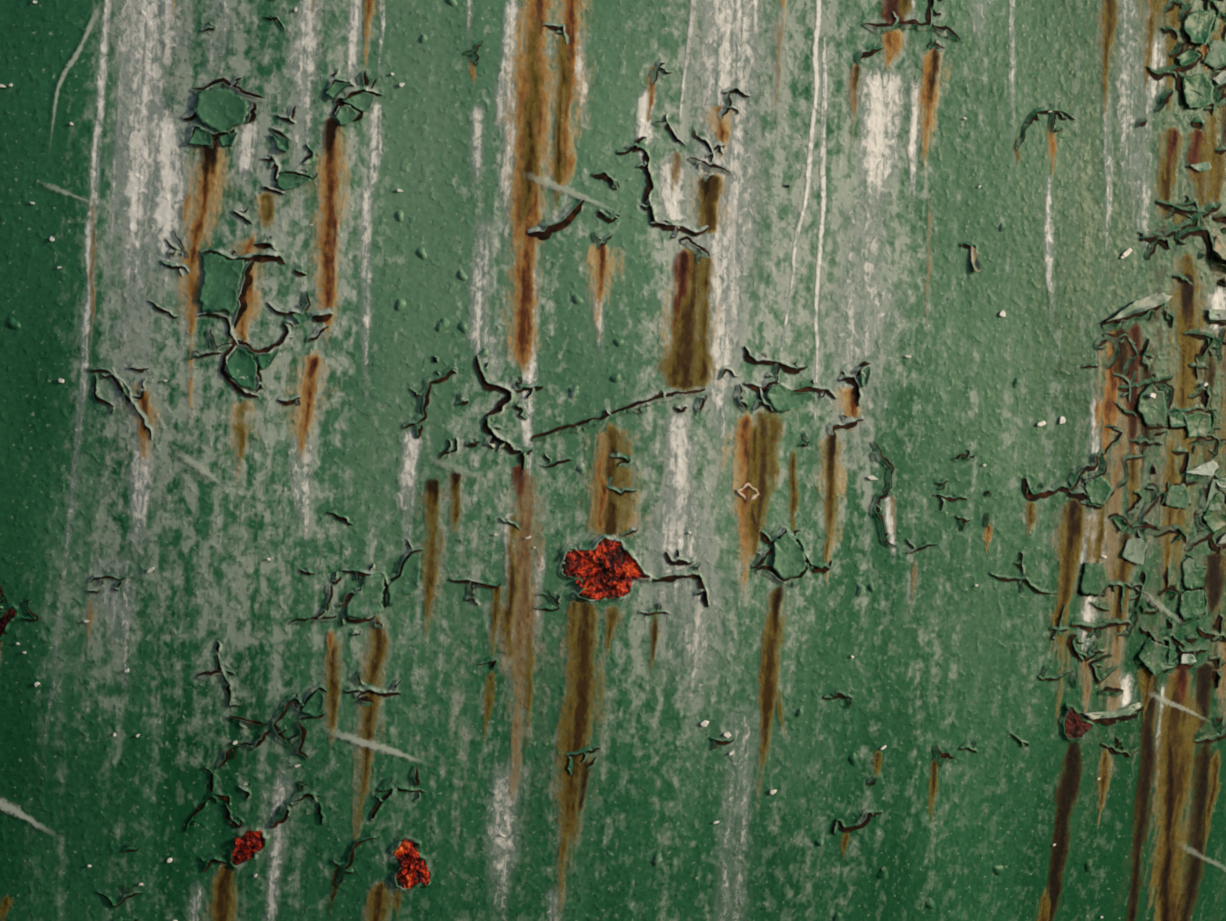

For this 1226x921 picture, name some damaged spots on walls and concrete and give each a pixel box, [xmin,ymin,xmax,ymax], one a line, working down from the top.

water stain [80,0,187,401]
peeling [189,247,334,398]
corrosion [509,0,585,367]
corrosion [662,248,712,390]
water stain [659,0,759,438]
water stain [780,0,828,417]
peeling [744,346,871,413]
water stain [834,69,921,412]
corrosion [1052,322,1155,712]
peeling [1023,293,1226,677]
peeling [1146,0,1226,116]
corrosion [1127,641,1226,921]